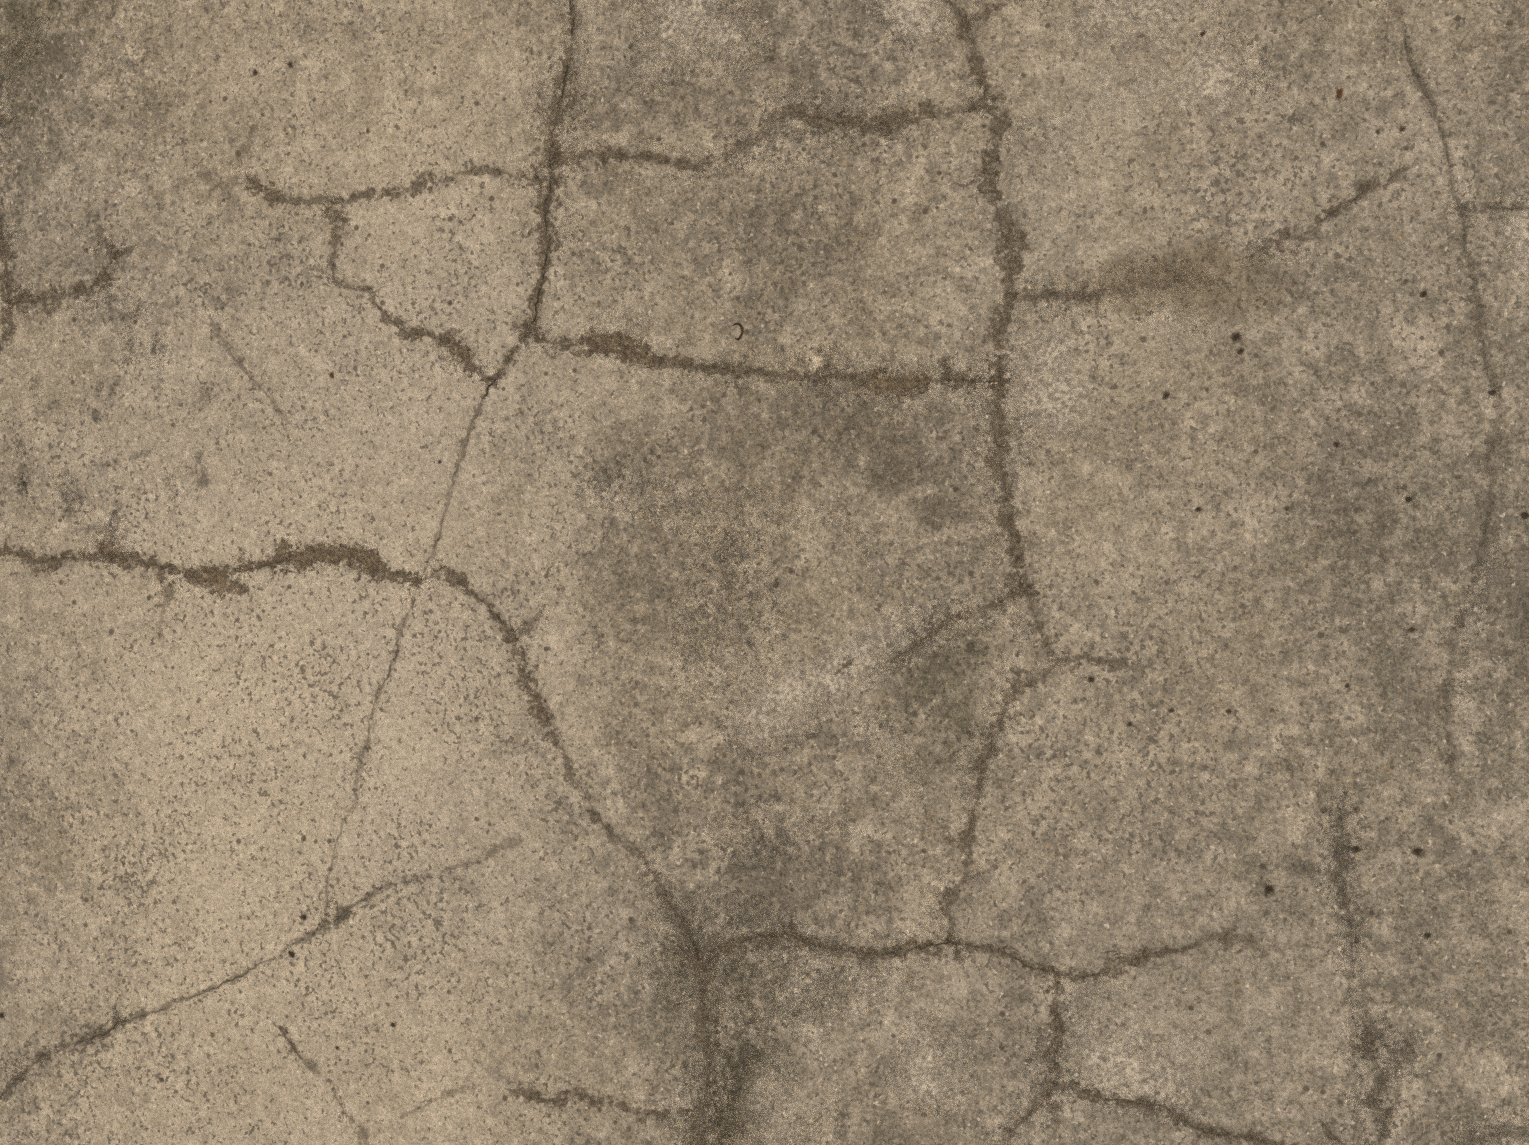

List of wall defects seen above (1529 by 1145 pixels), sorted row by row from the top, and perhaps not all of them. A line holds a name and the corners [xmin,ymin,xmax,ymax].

crack [1405,38,1459,202]
crack [0,197,126,351]
crack [244,0,1096,695]
crack [1269,174,1394,254]
crack [0,536,1338,1145]
crack [1356,1025,1399,1108]